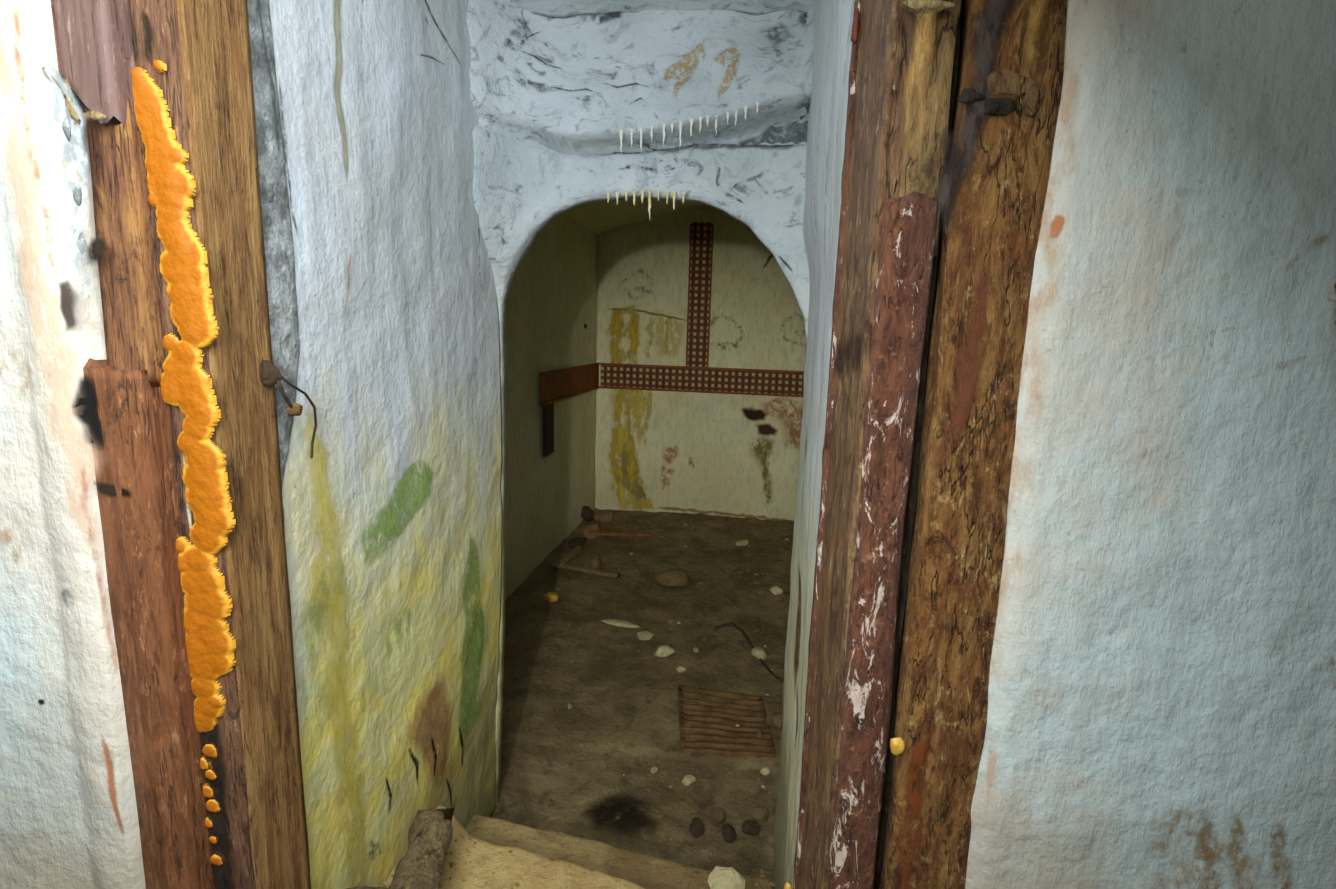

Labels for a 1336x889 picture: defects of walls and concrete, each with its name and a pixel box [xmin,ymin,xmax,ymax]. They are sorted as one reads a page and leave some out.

leakage [613,102,837,165]
leakage [609,270,681,363]
leakage [609,389,785,520]
rust [1198,824,1219,889]